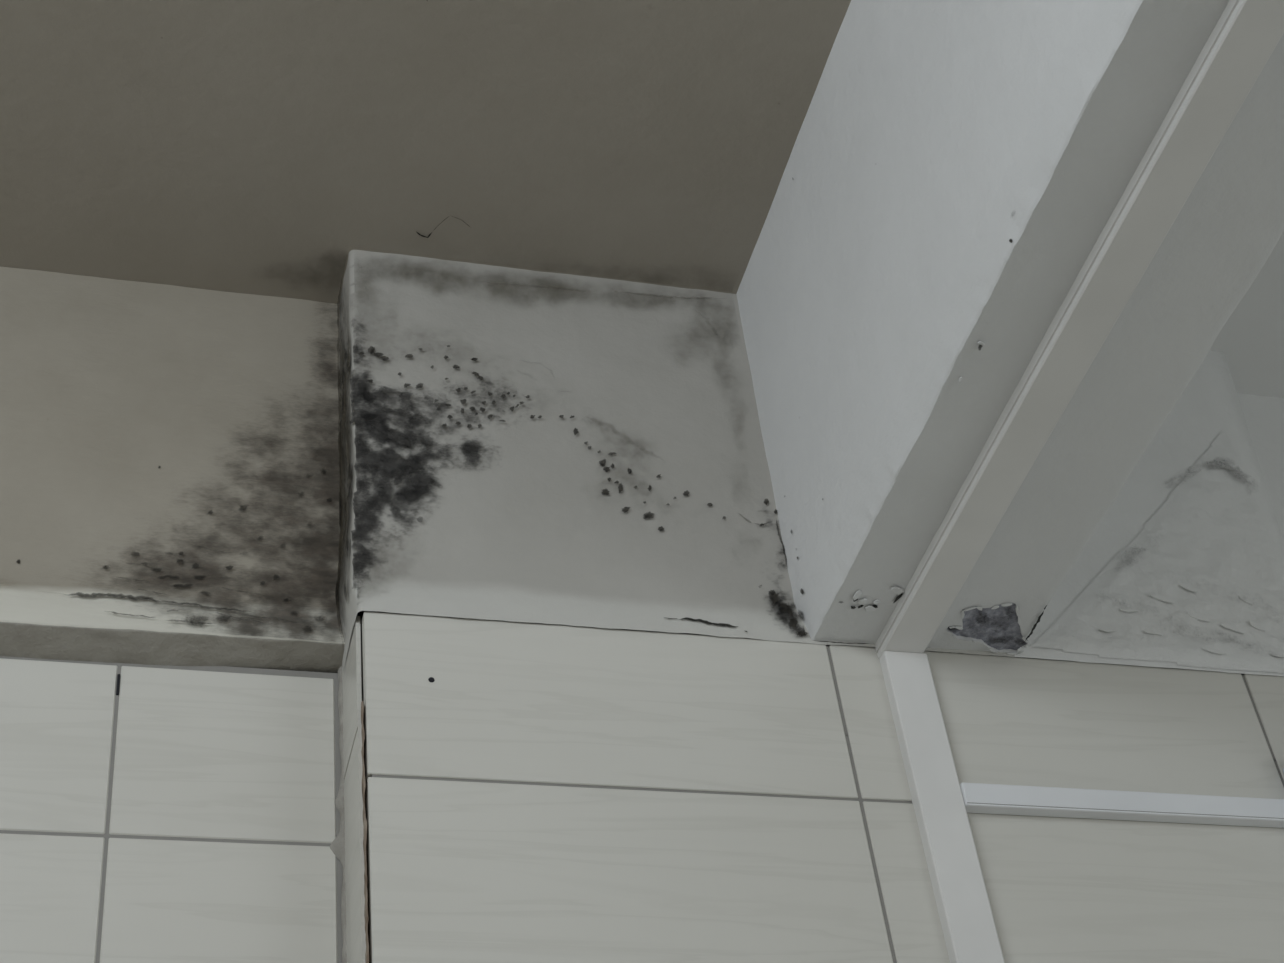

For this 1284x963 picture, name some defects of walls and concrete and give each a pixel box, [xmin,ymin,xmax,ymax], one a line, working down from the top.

damp [70,294,542,641]
damp [559,415,664,531]
damp [746,499,798,566]
damp [769,589,807,636]
flaking render [946,603,1031,655]